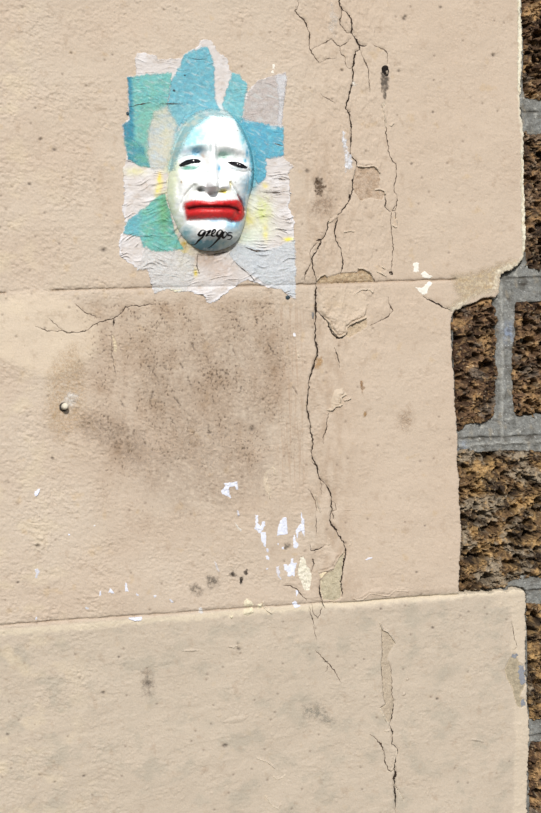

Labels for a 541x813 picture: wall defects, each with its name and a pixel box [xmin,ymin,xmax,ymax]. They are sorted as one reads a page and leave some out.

crack [381,106,398,275]
crack [36,303,156,373]
crack [295,0,388,594]
peeling [317,266,387,338]
peeling [298,540,352,591]
crack [284,585,341,682]
crack [371,635,398,811]